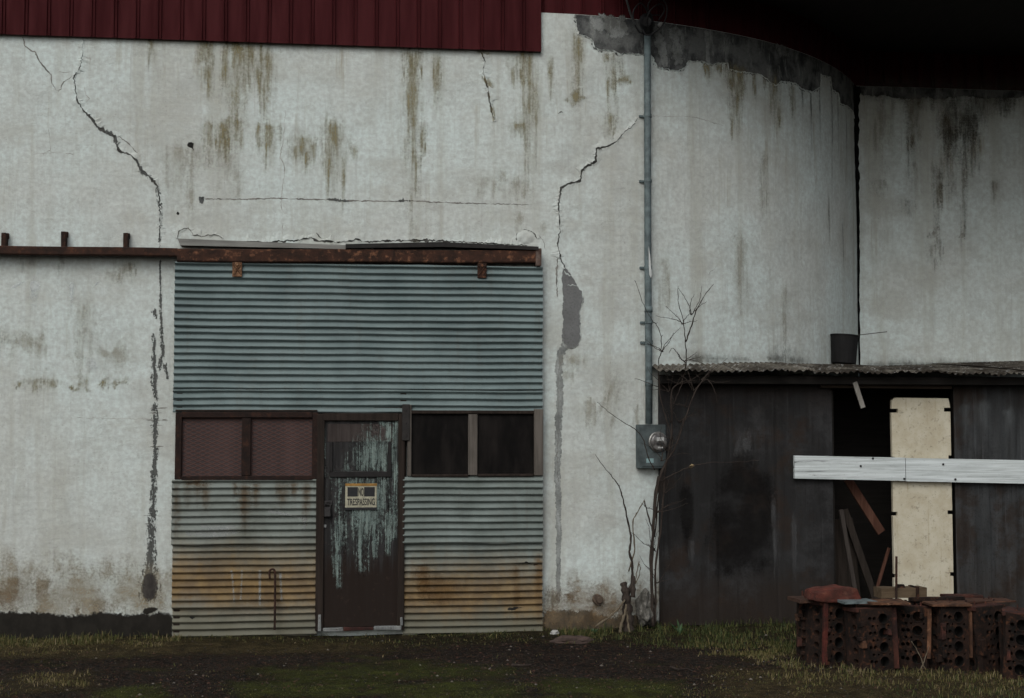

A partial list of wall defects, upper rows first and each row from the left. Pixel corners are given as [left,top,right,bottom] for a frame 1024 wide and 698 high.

leakage [208,119,242,152]
leakage [200,41,272,107]
leakage [257,125,272,156]
leakage [294,122,338,185]
crack [22,37,720,297]
leakage [407,52,442,170]
spalling [573,13,1024,119]
peeling [331,421,398,587]
leakage [0,557,173,639]
corrosion [268,568,276,630]